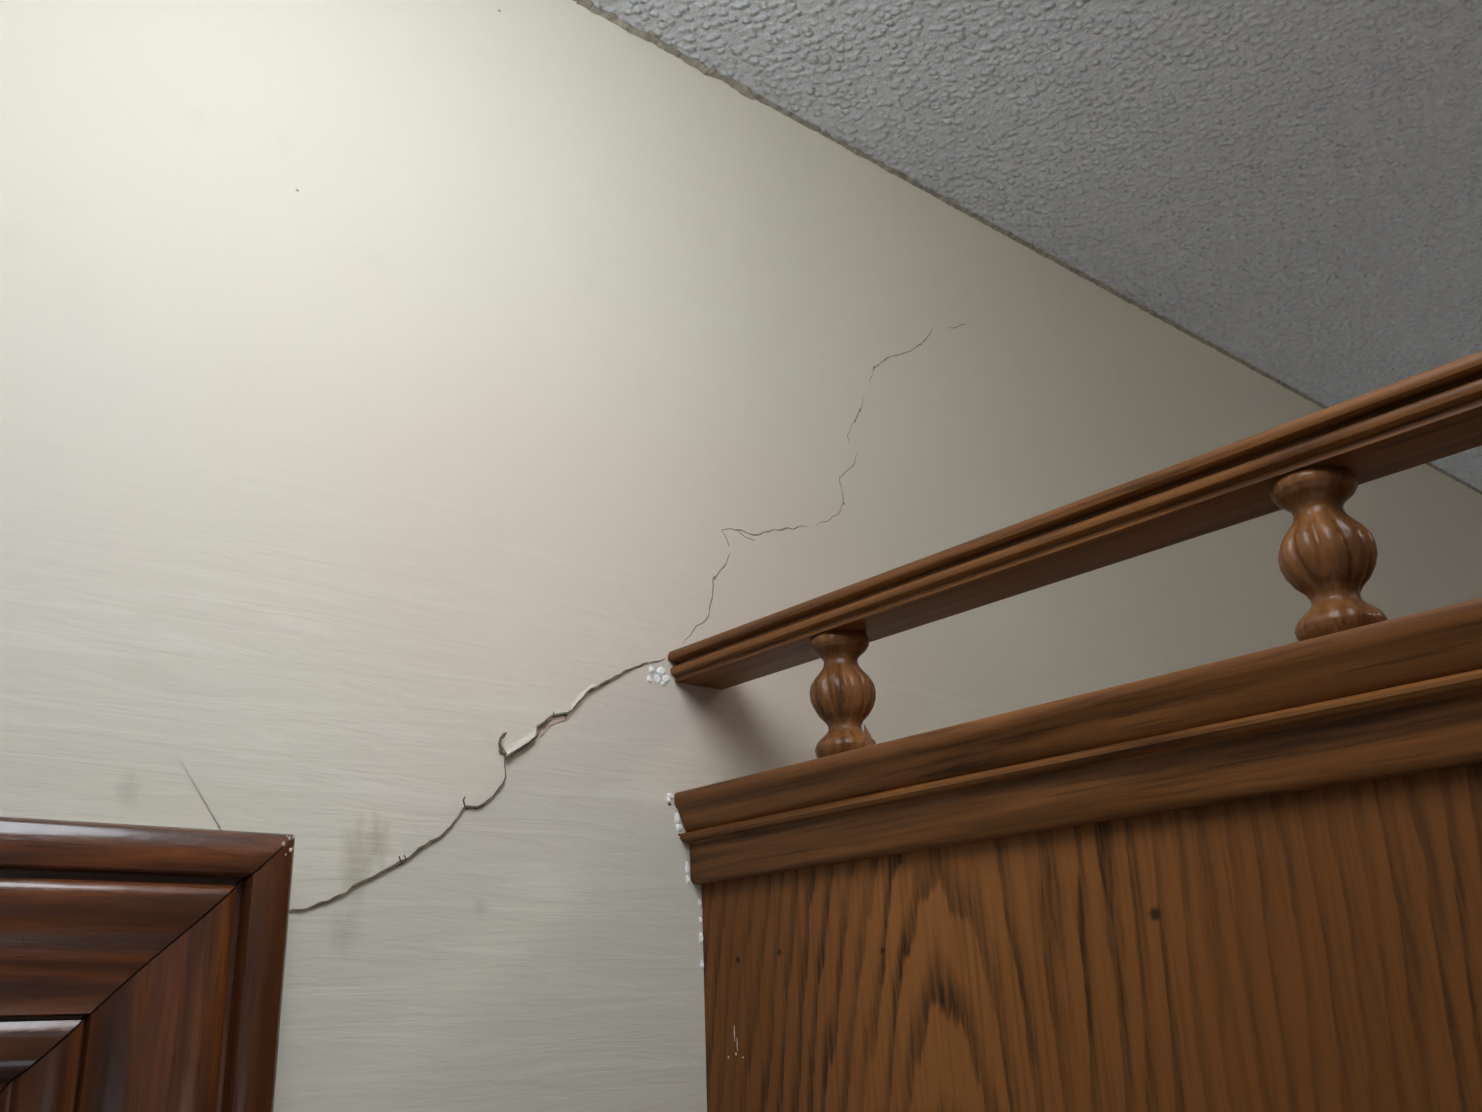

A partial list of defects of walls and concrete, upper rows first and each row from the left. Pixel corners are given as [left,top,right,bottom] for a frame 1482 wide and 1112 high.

crack [289,324,965,911]